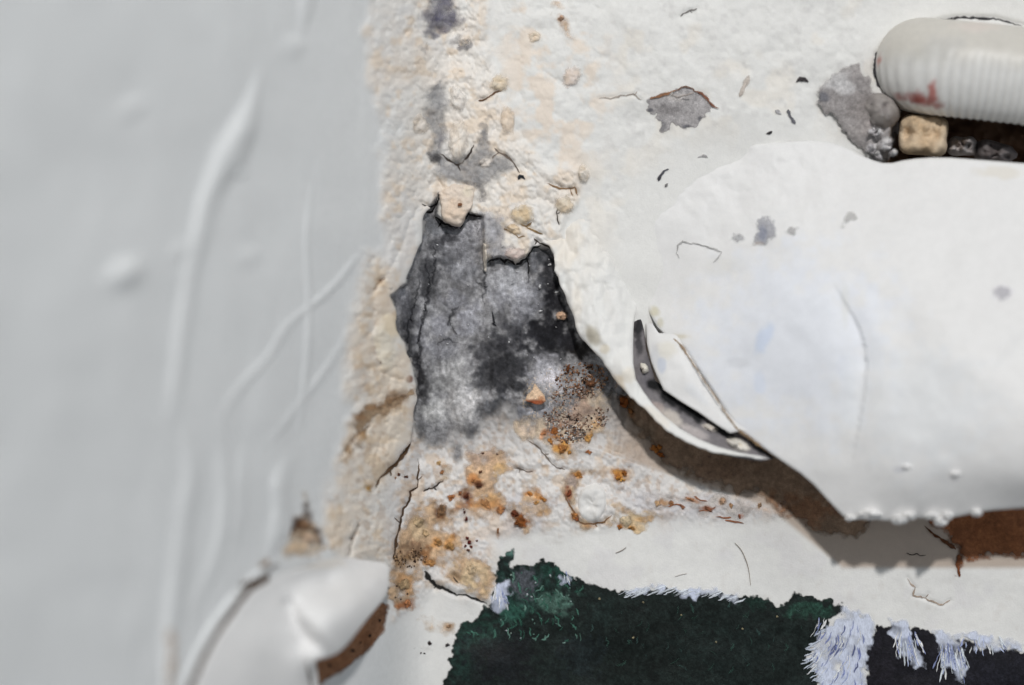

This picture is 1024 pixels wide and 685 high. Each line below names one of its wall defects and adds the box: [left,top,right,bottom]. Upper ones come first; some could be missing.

spalling [647,86,718,133]
peeling [373,183,475,478]
water stain [390,199,627,459]
crack [375,442,443,559]
rust [514,362,871,538]
rust [925,508,1024,577]